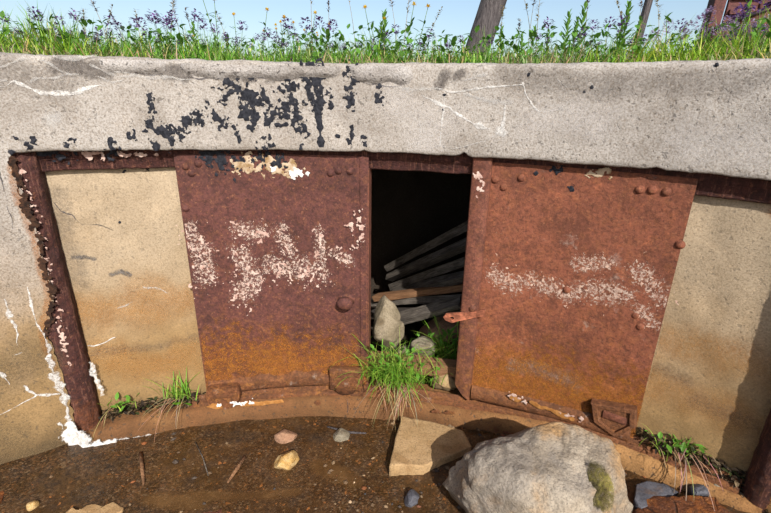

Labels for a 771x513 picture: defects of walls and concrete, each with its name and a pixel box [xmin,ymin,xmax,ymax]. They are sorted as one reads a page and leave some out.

peeling [13,56,360,183]
peeling [335,124,367,147]
spalling [7,150,79,431]
peeling [176,209,365,316]
efflorescence [43,333,149,448]
spalling [240,399,284,407]